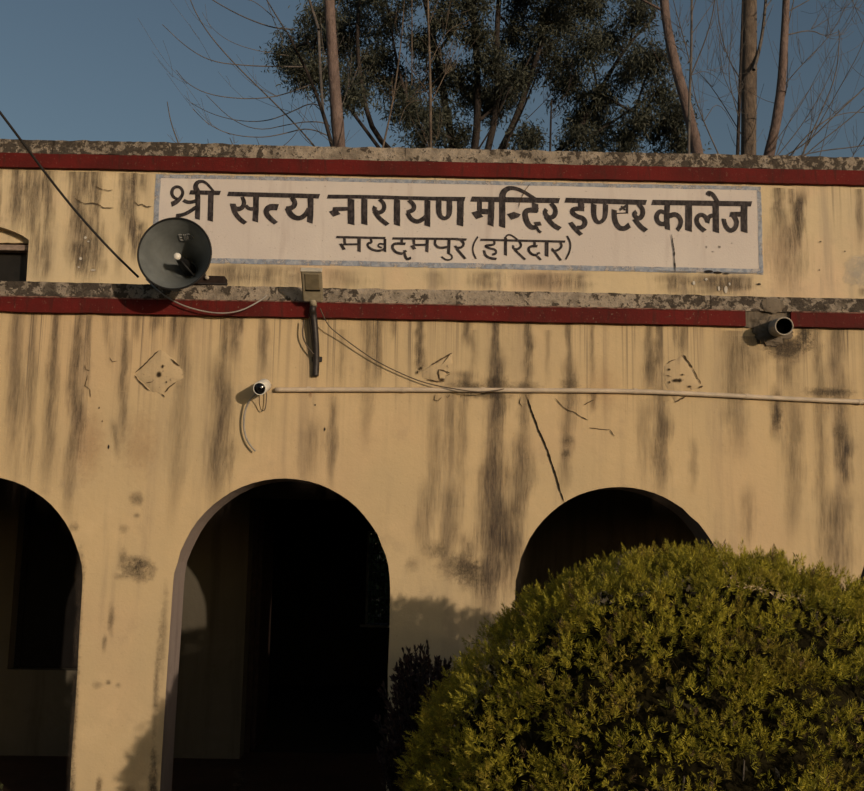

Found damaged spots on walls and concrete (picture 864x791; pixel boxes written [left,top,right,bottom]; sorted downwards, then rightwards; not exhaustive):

damp [129,219,141,252]
damp [795,197,803,235]
flaking render [135,350,184,397]
damp [212,384,227,470]
damp [481,322,512,597]
crack [519,395,564,501]
damp [840,441,849,477]